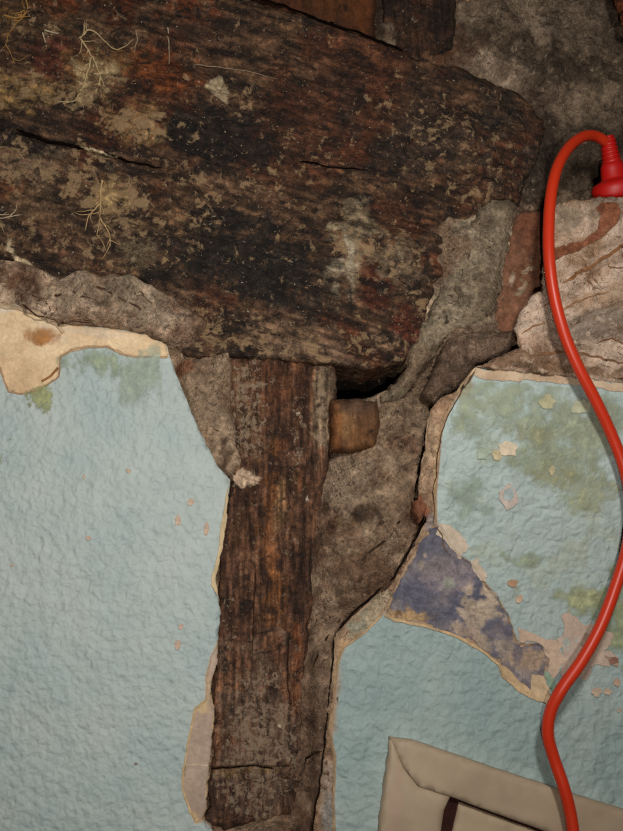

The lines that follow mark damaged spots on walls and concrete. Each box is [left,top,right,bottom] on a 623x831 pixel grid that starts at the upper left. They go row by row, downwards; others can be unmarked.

crack [522,244,623,334]
leakage [28,329,55,346]
peeling [0,303,169,395]
crack [534,337,623,379]
leakage [454,381,619,511]
leakage [601,398,623,429]
peeling [211,488,229,595]
crack [294,371,475,831]
peeling [314,368,595,831]
peeling [578,631,619,680]
leakage [606,586,623,649]
peeling [182,649,218,822]